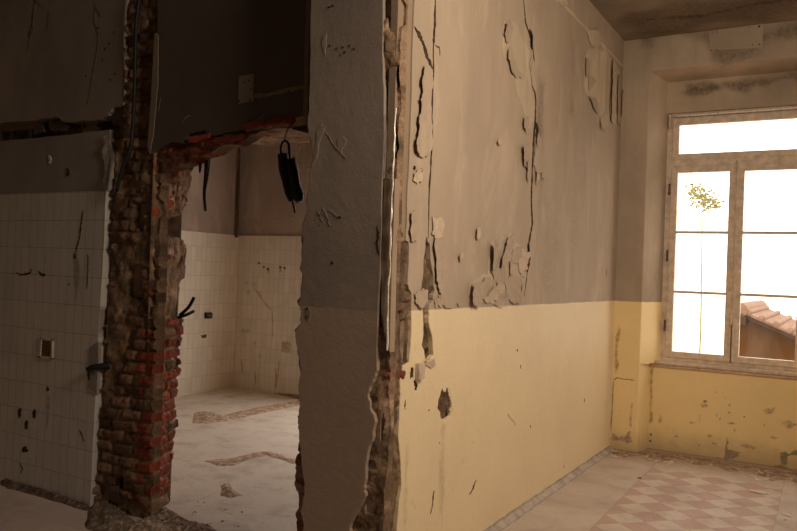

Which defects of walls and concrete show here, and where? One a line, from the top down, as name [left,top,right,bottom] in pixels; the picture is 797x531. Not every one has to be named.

flaking render [2,120,86,141]
flaking render [93,0,311,531]
flaking render [353,0,531,531]
peeling [502,21,547,185]
crack [523,0,535,62]
crack [524,90,539,295]
peeling [555,0,624,130]